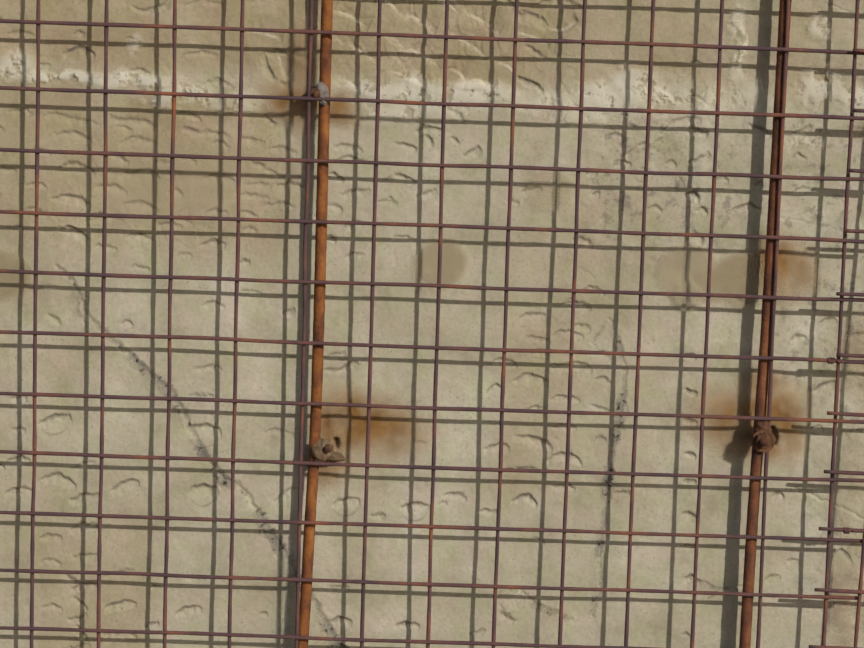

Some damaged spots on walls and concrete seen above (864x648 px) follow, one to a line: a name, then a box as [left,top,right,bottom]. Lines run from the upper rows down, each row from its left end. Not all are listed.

water stain [0,55,211,104]
water stain [344,75,509,117]
water stain [583,72,682,119]
water stain [806,78,864,104]
water stain [0,251,30,299]
water stain [417,241,466,284]
water stain [663,248,765,305]
corrosion [318,390,418,480]
corrosion [704,372,758,457]
corrosion [763,373,804,458]
crack [98,328,347,648]
crack [597,373,627,557]